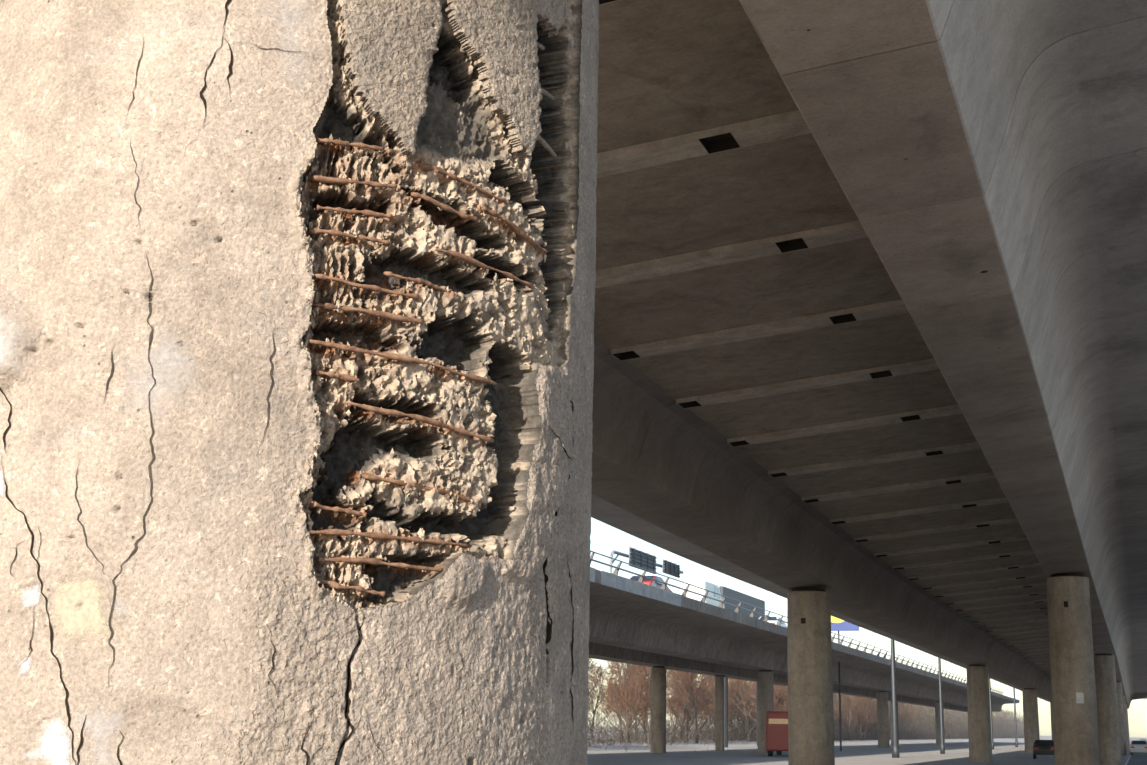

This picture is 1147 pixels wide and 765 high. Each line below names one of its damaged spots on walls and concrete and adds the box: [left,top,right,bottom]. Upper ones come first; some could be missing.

crack [183,0,303,157]
crack [75,39,156,686]
spalling [295,0,583,619]
crack [551,400,574,479]
crack [0,388,87,765]
crack [301,622,388,765]
crack [543,511,574,731]